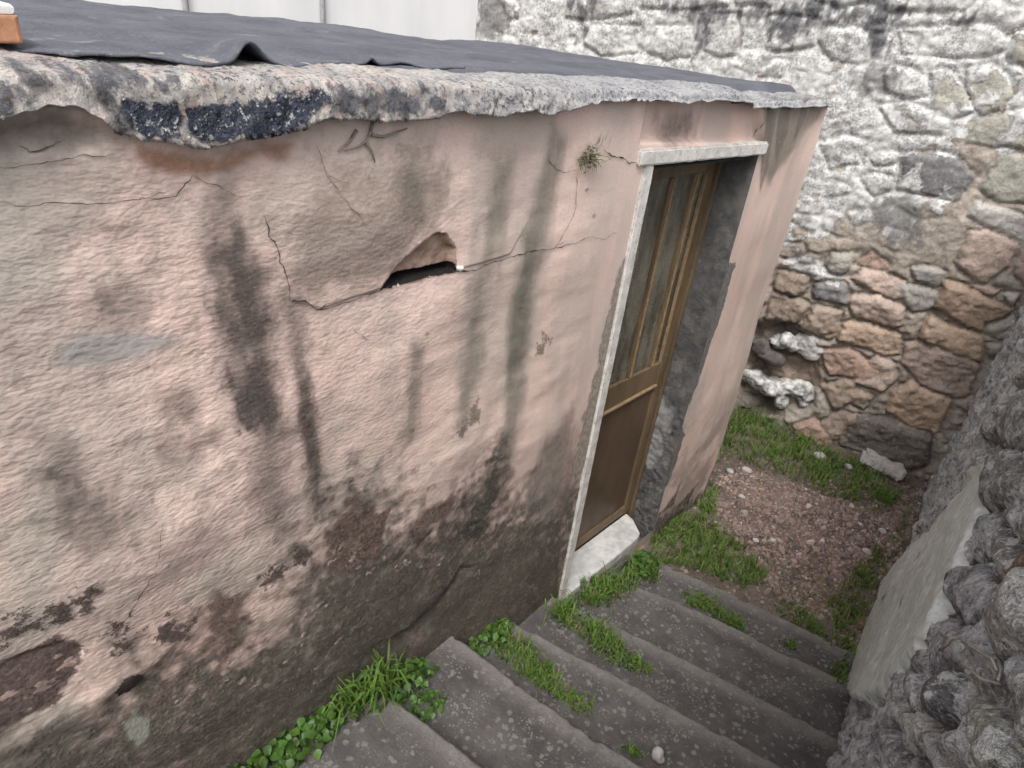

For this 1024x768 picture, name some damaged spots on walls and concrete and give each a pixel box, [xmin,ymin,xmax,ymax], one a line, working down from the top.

crack [0,139,120,168]
crack [7,175,245,207]
crack [454,153,613,272]
crack [265,217,382,310]
hole [380,231,464,290]
water stain [212,231,278,508]
peeling [535,330,553,355]
water stain [300,376,318,469]
water stain [0,395,580,768]
peeling [0,580,103,734]
hole [115,674,143,697]
peeling [98,603,197,659]